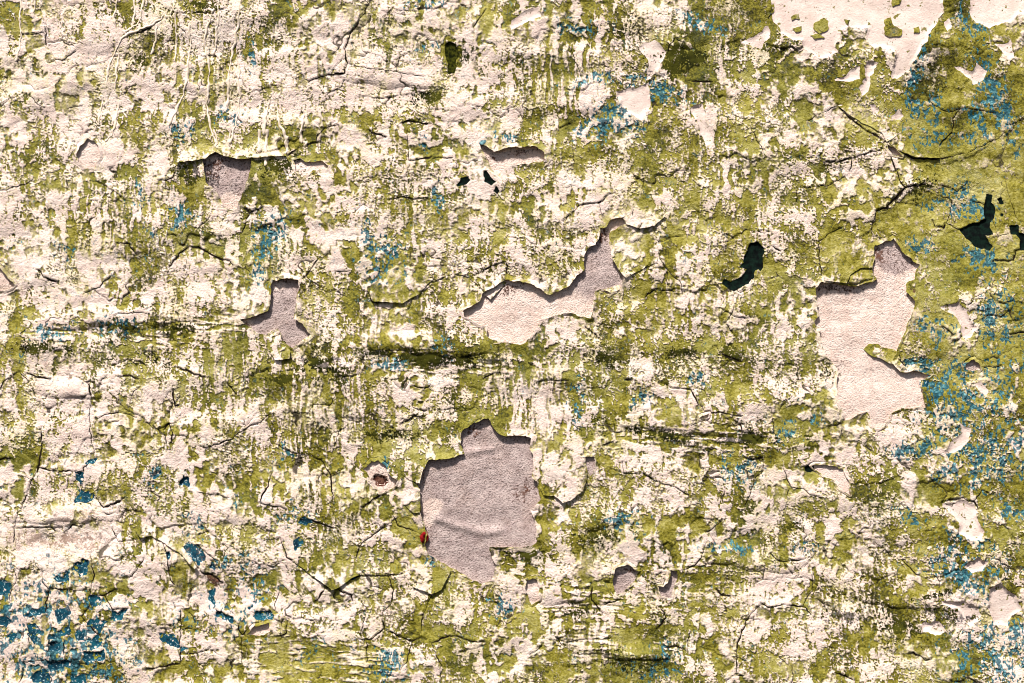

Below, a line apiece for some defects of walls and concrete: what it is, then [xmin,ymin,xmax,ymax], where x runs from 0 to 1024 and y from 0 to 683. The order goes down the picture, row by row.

peeling [741,0,952,79]
peeling [175,144,333,215]
peeling [474,139,555,194]
crack [796,92,1024,262]
peeling [960,194,1024,251]
peeling [236,273,318,360]
peeling [458,194,665,352]
peeling [722,242,764,291]
peeling [810,229,935,432]
peeling [360,410,598,594]
crack [264,485,483,683]